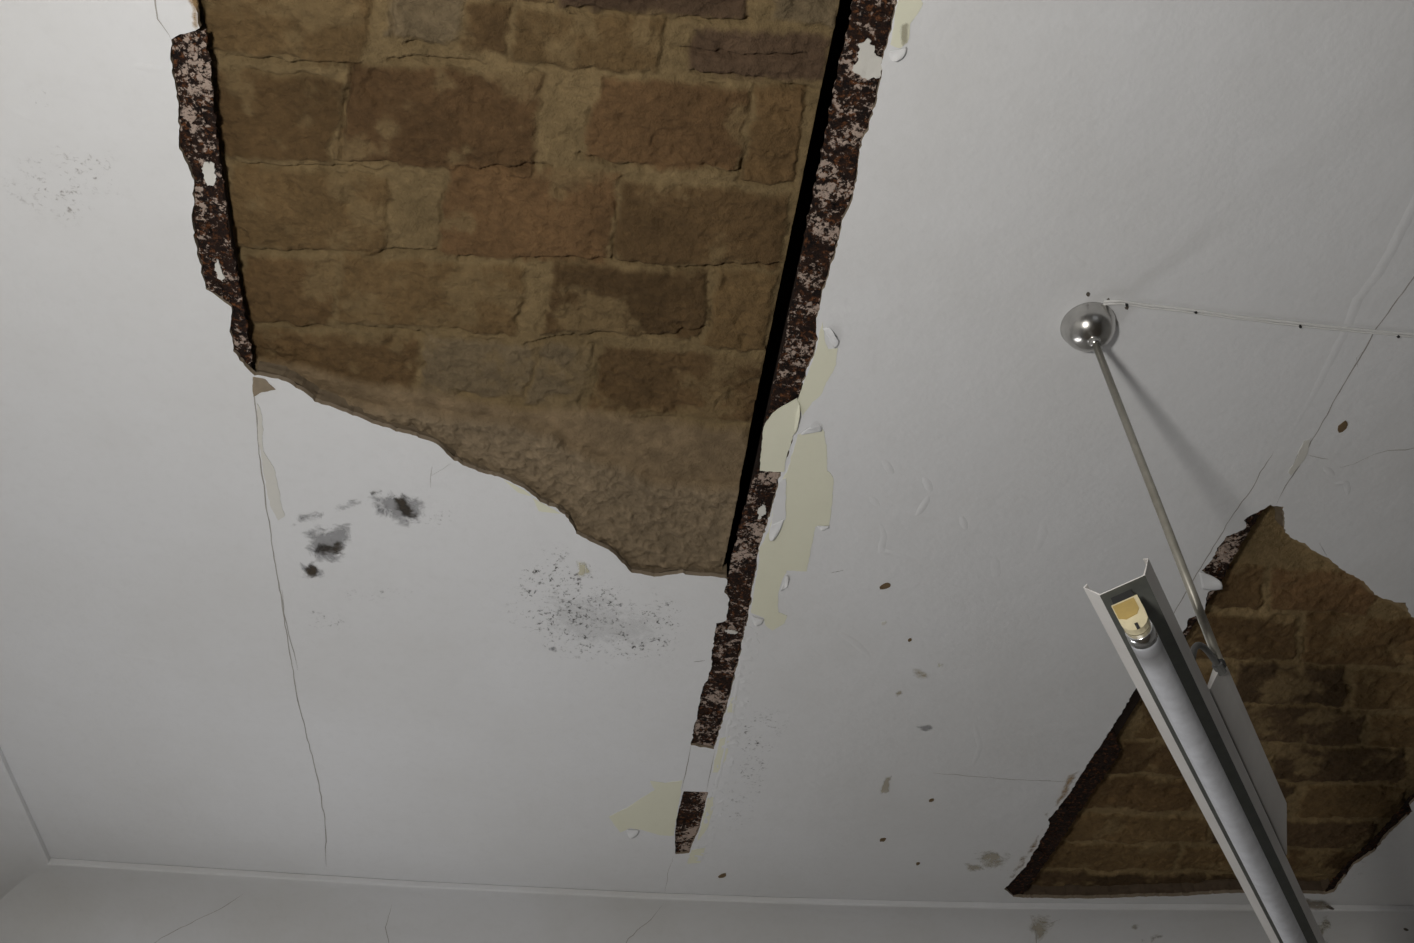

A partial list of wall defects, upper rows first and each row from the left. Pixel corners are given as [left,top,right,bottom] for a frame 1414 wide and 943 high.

flaking render [198,0,839,631]
crack [252,379,327,867]
mould [300,517,346,577]
mould [372,492,418,522]
damp [533,564,611,651]
peeling [609,780,682,839]
peeling [687,797,714,864]
flaking render [1022,698,1243,895]
crack [1174,277,1414,613]
flaking render [1185,505,1414,910]